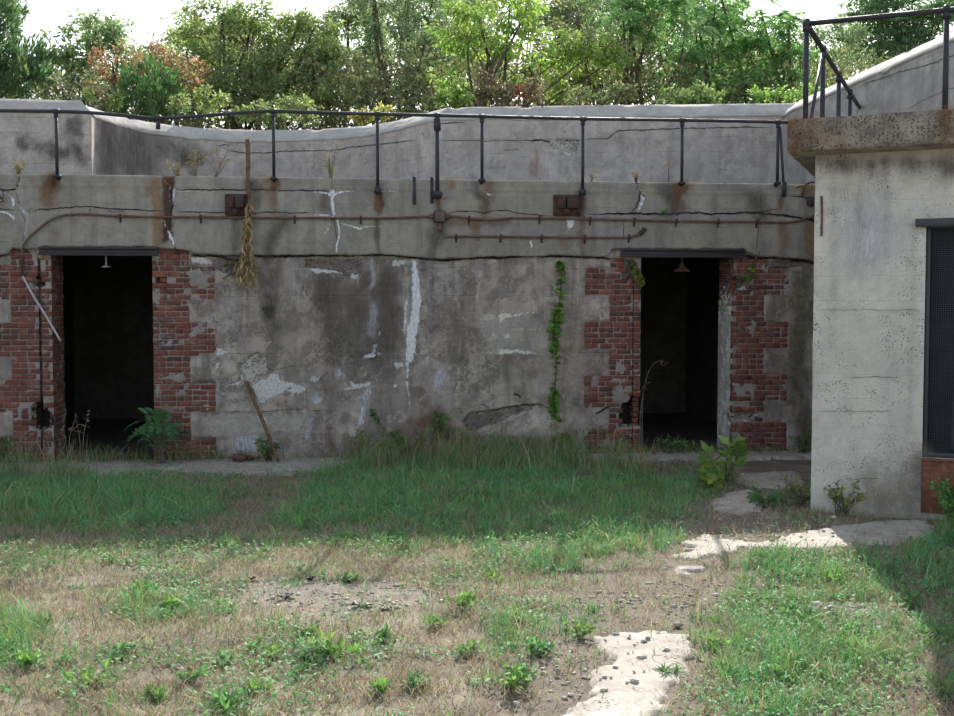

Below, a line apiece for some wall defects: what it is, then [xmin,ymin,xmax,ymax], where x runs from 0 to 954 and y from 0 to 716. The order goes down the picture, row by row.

crack [213,122,770,153]
rust [153,177,174,243]
water stain [312,189,382,253]
water stain [318,259,422,404]
spalling [32,402,53,430]
flaking render [202,354,322,452]
spalling [463,404,535,435]
spalling [619,396,642,427]